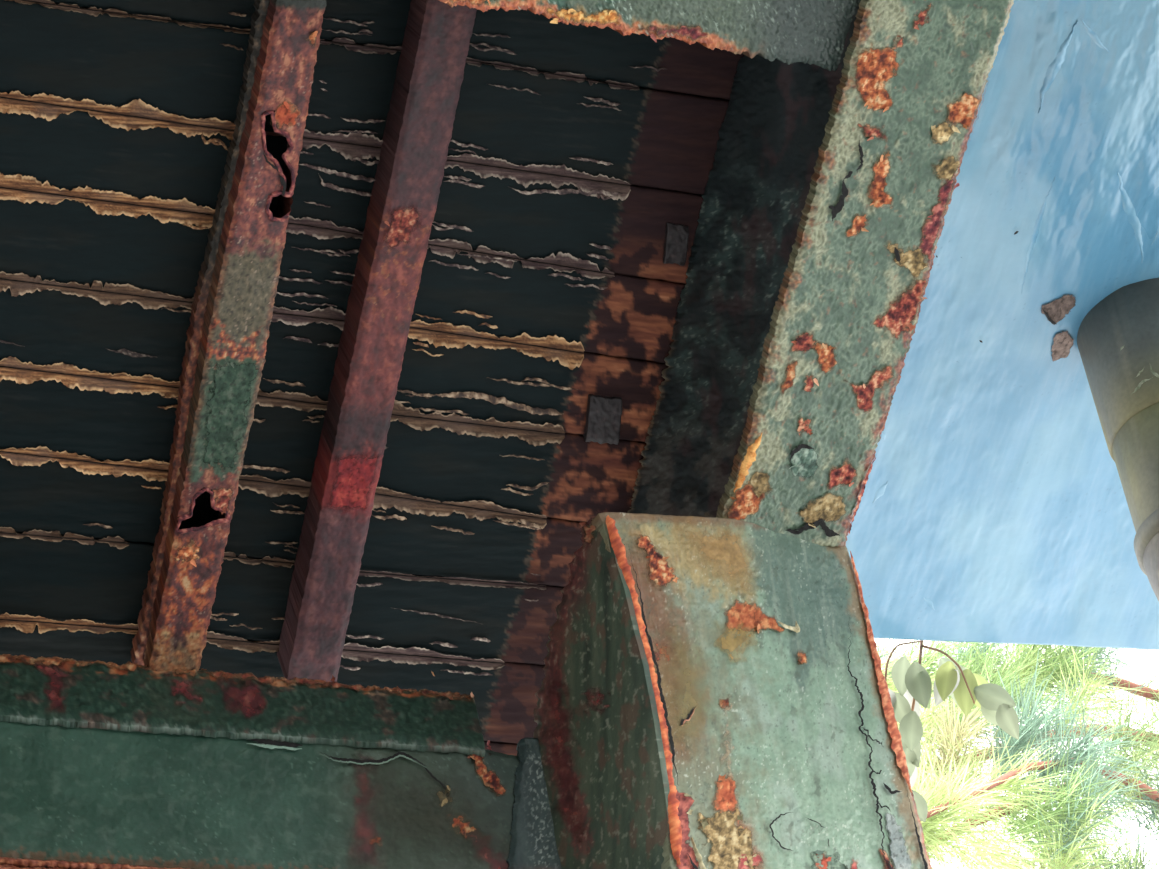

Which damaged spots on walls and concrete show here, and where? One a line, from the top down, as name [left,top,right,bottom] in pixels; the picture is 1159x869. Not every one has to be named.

rust [855,3,931,112]
peeling [0,91,236,150]
peeling [0,173,215,230]
peeling [444,140,631,201]
rust [873,89,986,339]
peeling [408,310,584,370]
peeling [0,356,181,410]
peeling [390,390,565,461]
rust [726,433,772,520]
rust [799,458,876,534]
rust [579,515,702,865]
crack [847,614,928,869]